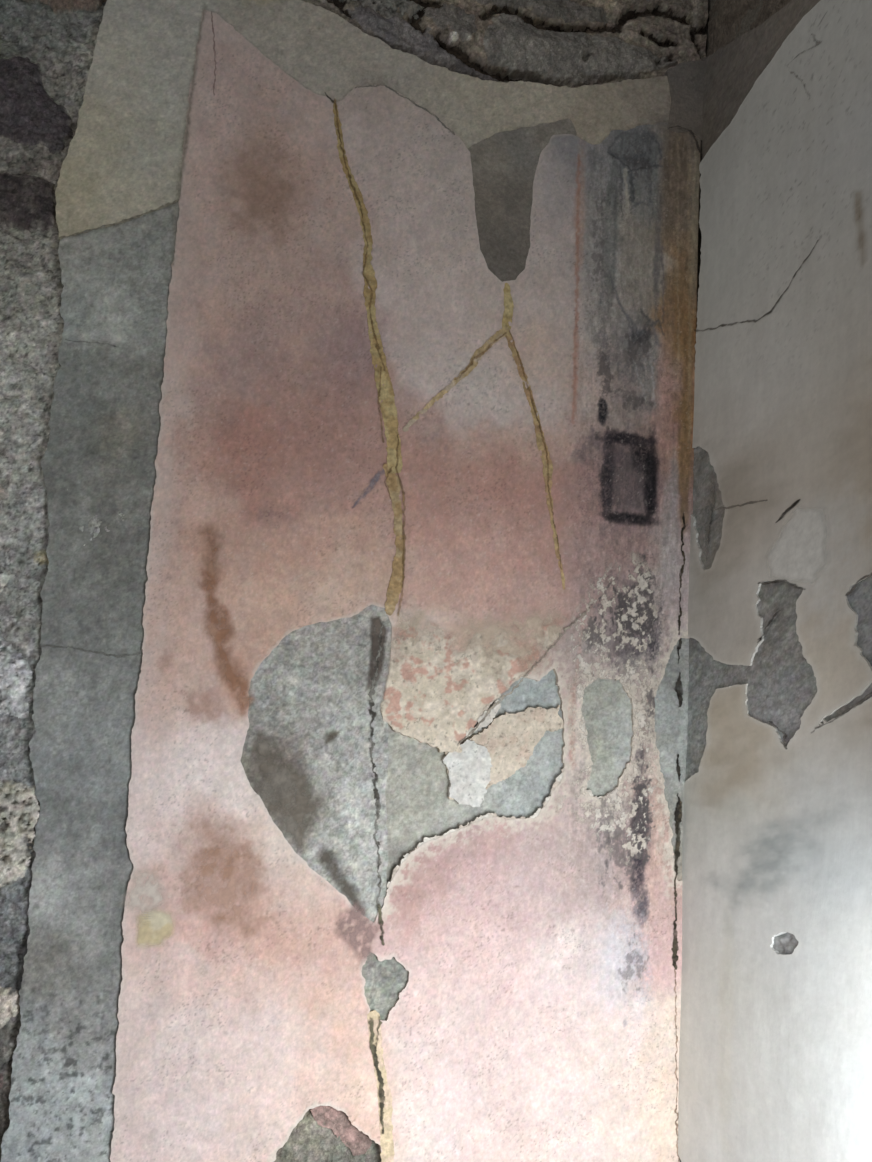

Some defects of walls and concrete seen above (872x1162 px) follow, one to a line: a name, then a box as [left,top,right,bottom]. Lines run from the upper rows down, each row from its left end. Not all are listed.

peeling [468,119,577,282]
crack [694,240,818,331]
crack [325,85,565,946]
crack [776,499,800,522]
crack [458,608,590,744]
spalling [240,509,826,923]
crack [675,513,686,707]
spalling [815,683,872,729]
spalling [846,573,872,666]
crack [671,754,682,1161]
spalling [274,1105,381,1162]
crack [367,1010,395,1162]